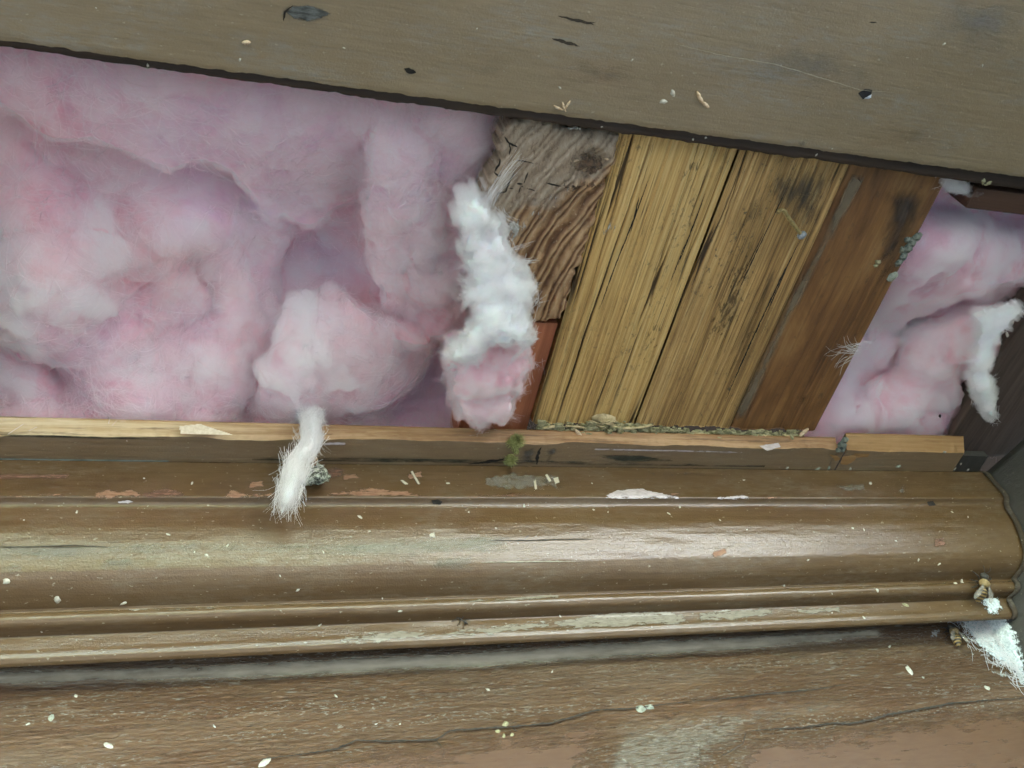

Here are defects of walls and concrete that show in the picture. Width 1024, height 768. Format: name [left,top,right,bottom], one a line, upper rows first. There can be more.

peeling [95,489,184,503]
peeling [225,480,274,498]
peeling [327,471,422,496]
peeling [699,607,772,621]
peeling [341,612,685,644]
crack [241,684,844,763]
crack [720,697,1024,757]